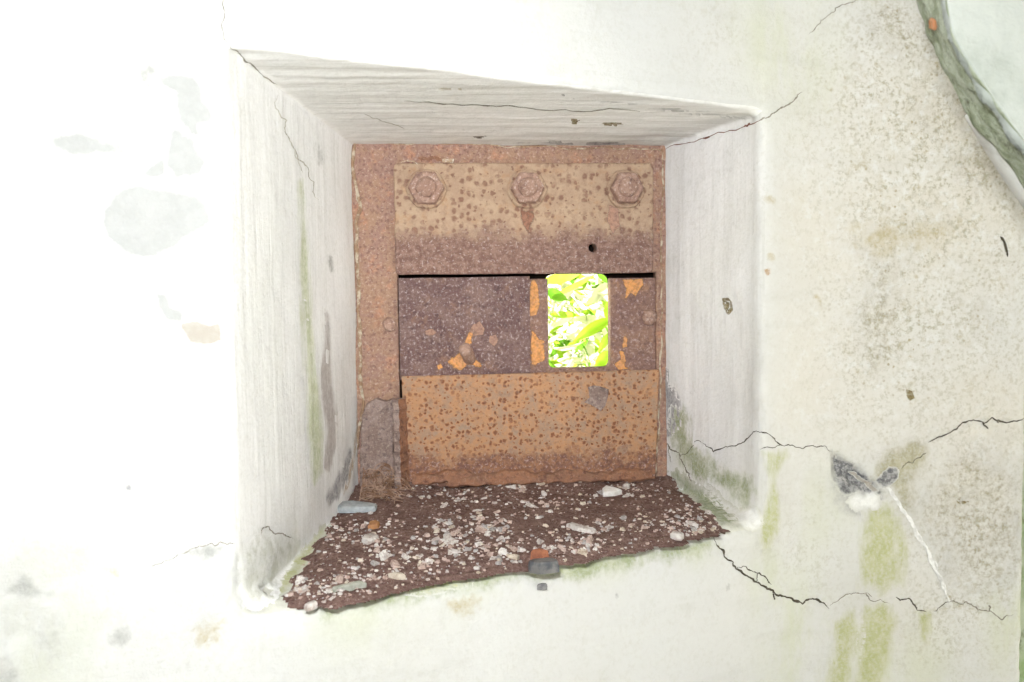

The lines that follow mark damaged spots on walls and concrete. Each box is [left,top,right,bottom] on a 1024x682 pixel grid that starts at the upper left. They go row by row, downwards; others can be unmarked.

crack [221,1,319,200]
crack [410,101,640,112]
crack [666,93,800,149]
rust [521,210,534,231]
rust [469,321,498,346]
leakage [325,446,355,509]
crack [667,431,831,481]
spalling [825,449,900,522]
crack [901,417,1024,469]
leakage [870,437,1024,606]
crack [714,539,1012,620]